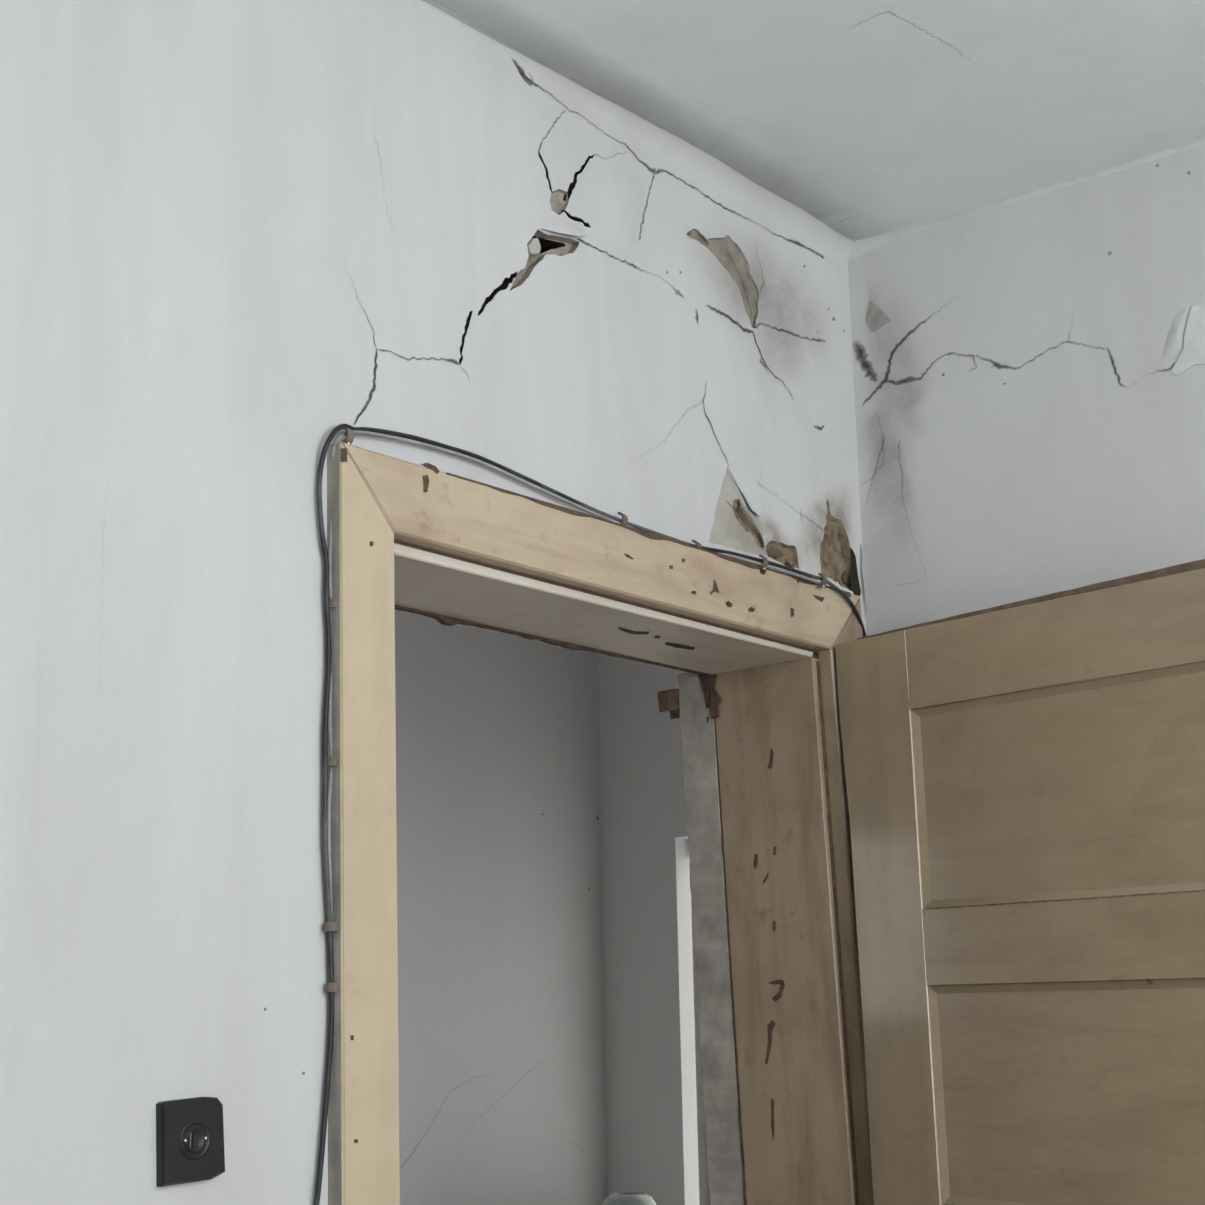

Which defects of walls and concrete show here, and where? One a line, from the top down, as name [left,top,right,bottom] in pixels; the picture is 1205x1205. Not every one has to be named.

crack [513,59,744,268]
spalling [510,221,586,291]
flaking render [687,229,763,327]
crack [784,238,824,258]
crack [354,271,517,425]
crack [680,294,823,396]
crack [862,321,1032,406]
crack [1108,350,1121,385]
flaking render [421,463,868,619]